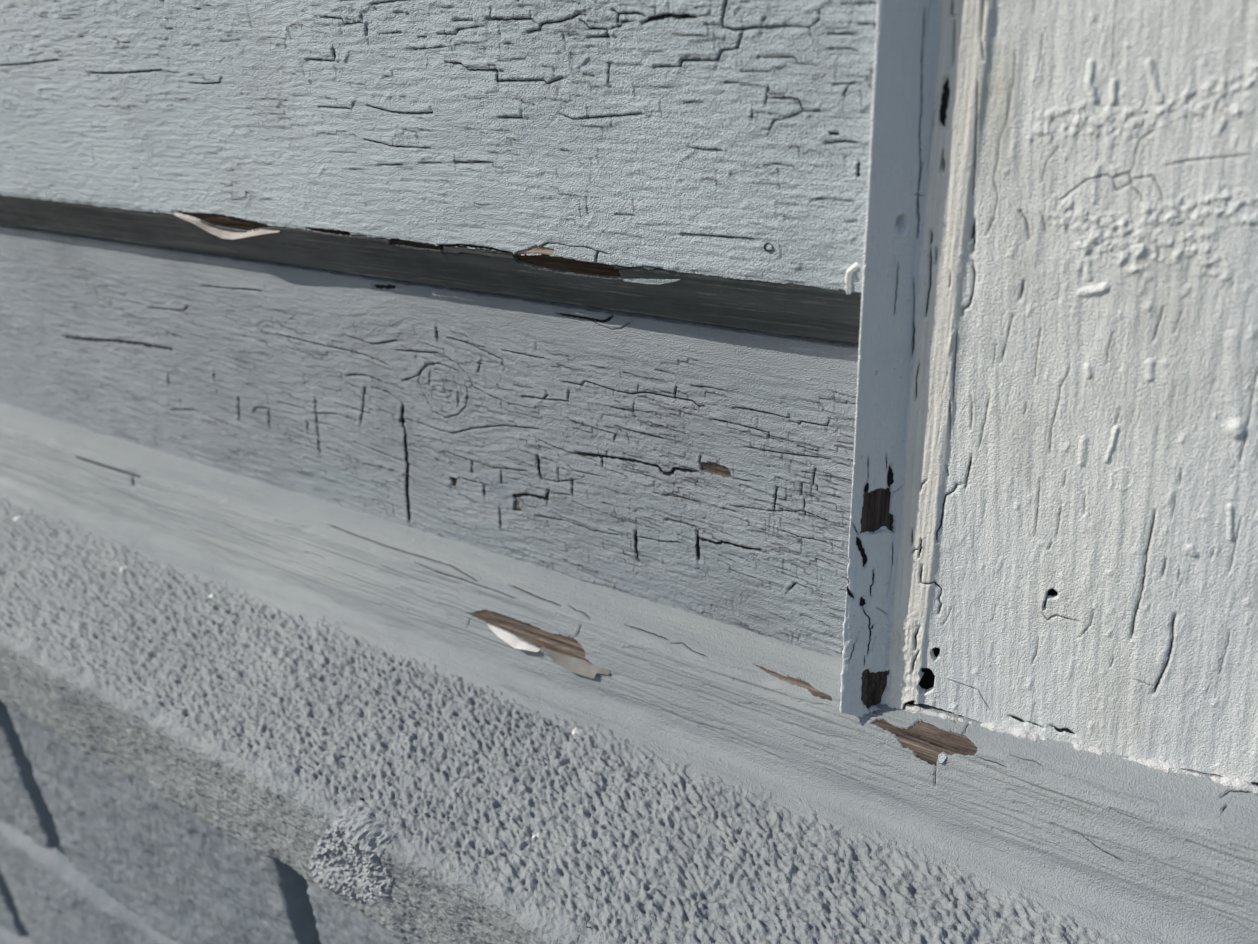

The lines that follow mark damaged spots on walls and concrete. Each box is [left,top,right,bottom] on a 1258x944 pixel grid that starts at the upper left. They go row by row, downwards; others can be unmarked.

peeling [174,210,280,239]
peeling [515,246,680,284]
crack [65,0,1070,668]
peeling [860,488,894,535]
crack [1034,474,1085,548]
crack [1111,470,1182,665]
peeling [469,610,611,679]
peeling [754,664,832,701]
peeling [861,669,978,766]
crack [953,681,1074,767]
crack [1032,612,1094,663]
crack [1138,615,1176,692]